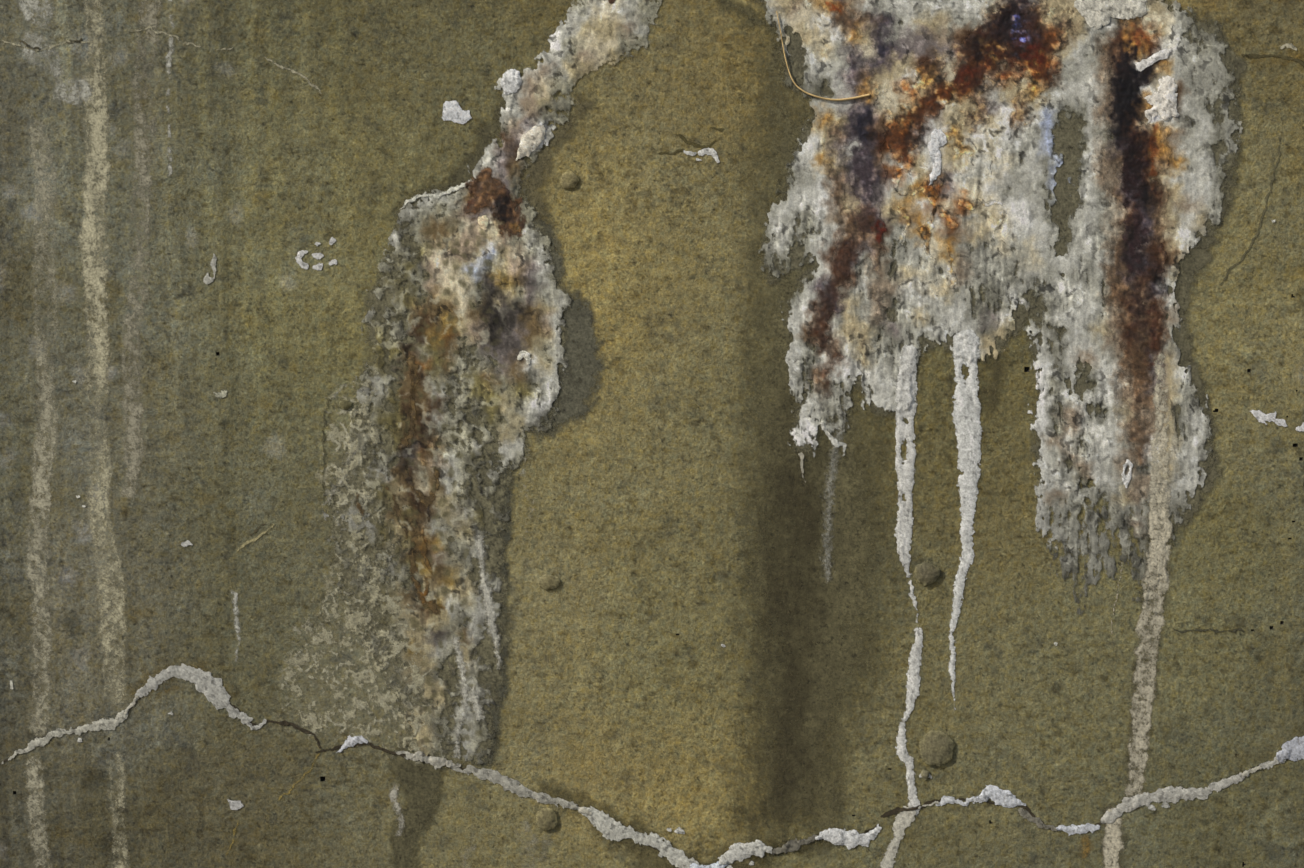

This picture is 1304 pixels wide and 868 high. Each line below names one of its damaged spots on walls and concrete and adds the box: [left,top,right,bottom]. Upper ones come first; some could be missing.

efflorescence [19,0,174,735]
rust [386,354,445,615]
damp [281,0,662,868]
rust [464,167,526,237]
damp [539,0,1247,868]
rust [809,0,1078,399]
rust [1094,17,1172,498]
crack [1173,626,1244,634]
efflorescence [27,757,50,866]
efflorescence [111,754,125,824]
crack [0,663,1304,868]